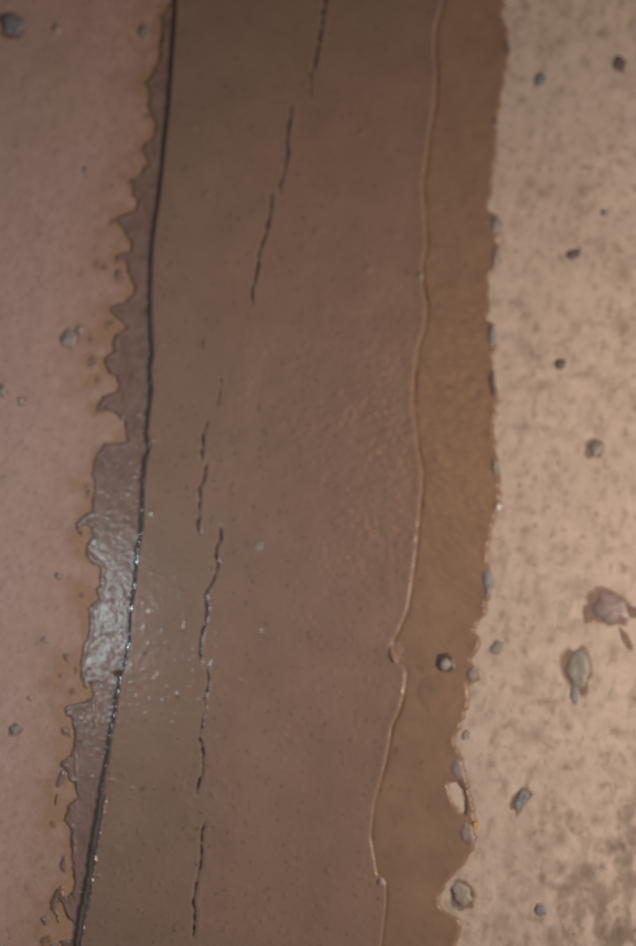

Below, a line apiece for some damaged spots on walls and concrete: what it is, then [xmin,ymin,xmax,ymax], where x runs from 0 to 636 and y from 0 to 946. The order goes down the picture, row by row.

crack [251,0,328,305]
peeling [41,0,175,946]
crack [196,378,224,795]
spalling [489,640,506,655]
peeling [449,758,476,845]
spalling [510,788,532,815]
crack [192,822,205,936]
spalling [450,880,474,910]